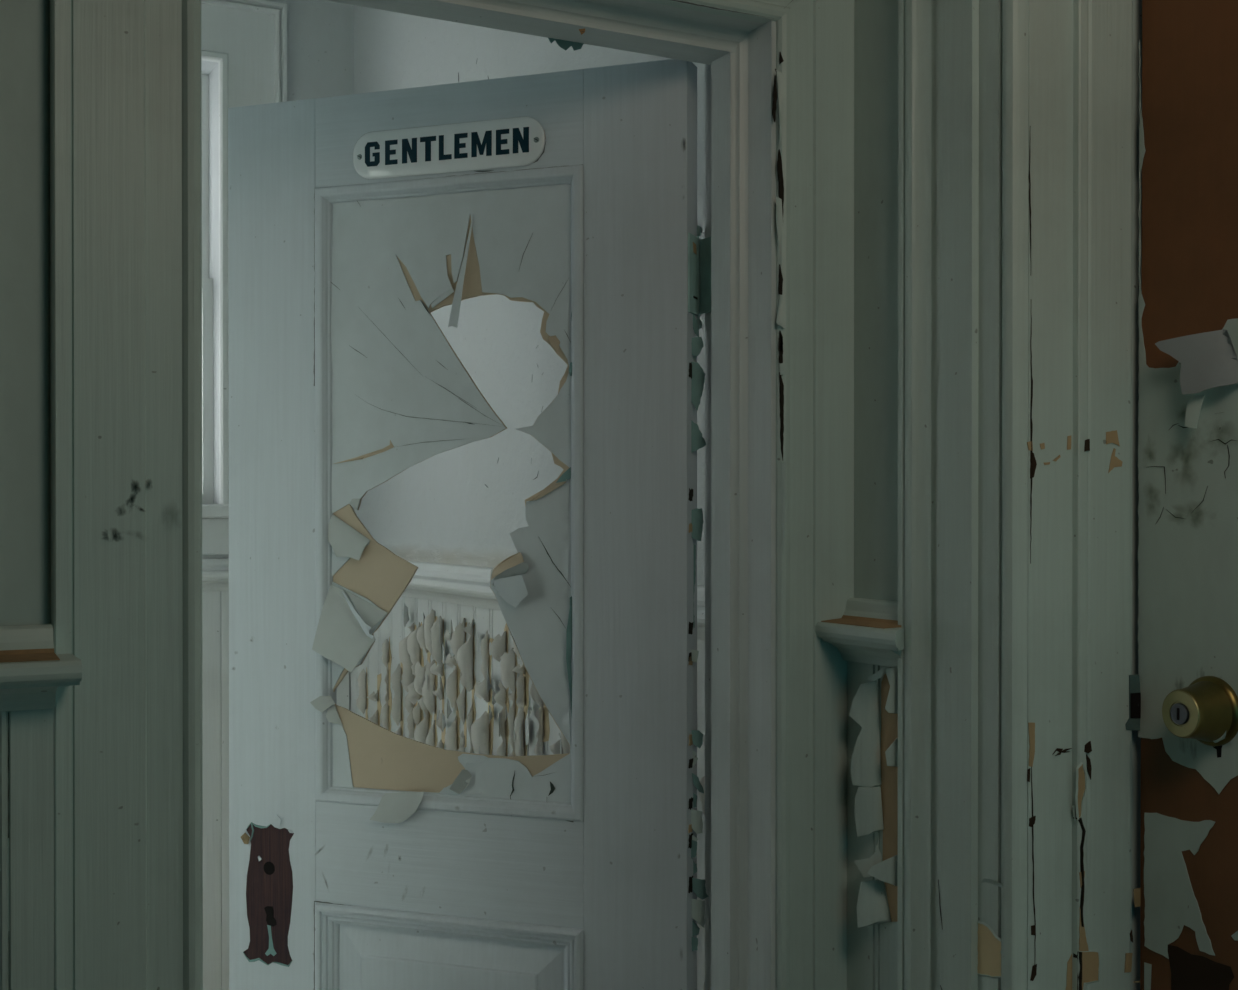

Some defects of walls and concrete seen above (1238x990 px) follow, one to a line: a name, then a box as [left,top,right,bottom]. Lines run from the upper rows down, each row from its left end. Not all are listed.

crack [1026,126,1034,258]
peeling [689,314,706,453]
crack [1027,316,1035,564]
peeling [688,488,704,634]
peeling [356,603,569,756]
peeling [688,730,708,900]
peeling [849,666,898,928]
crack [1031,748,1072,965]
peeling [692,921,700,951]